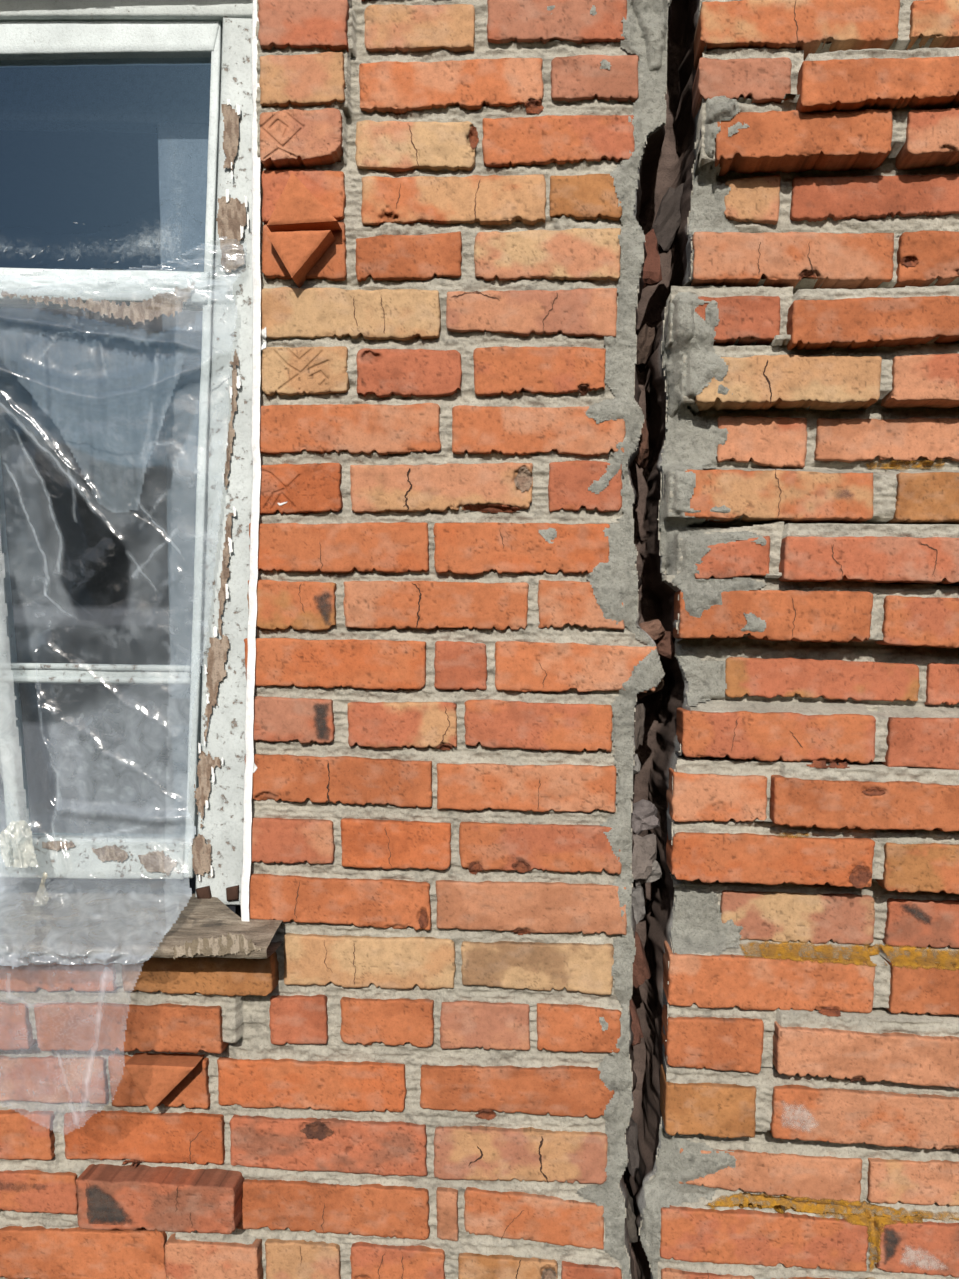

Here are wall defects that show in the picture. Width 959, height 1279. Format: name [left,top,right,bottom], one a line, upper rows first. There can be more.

peeling [216,99,249,273]
peeling [222,349,241,490]
peeling [91,506,236,881]
crack [619,0,707,1279]
peeling [42,841,75,851]